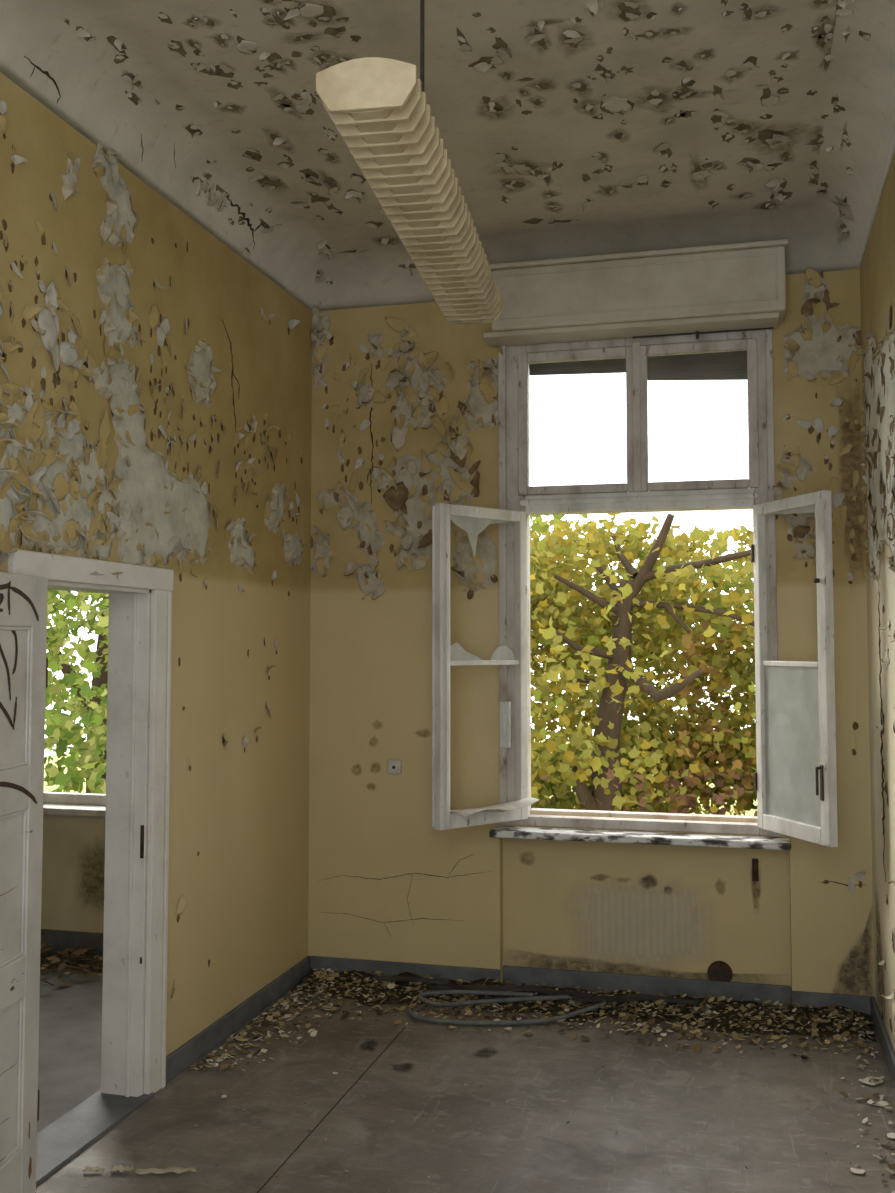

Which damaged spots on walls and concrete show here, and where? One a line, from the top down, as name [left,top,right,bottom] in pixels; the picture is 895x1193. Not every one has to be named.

peeling [61,18,160,105]
peeling [167,0,361,115]
peeling [456,27,552,118]
peeling [525,0,685,50]
peeling [811,0,871,70]
peeling [492,146,594,226]
peeling [572,47,797,209]
peeling [806,97,855,235]
peeling [772,267,895,592]
water stain [84,853,105,900]
crack [323,854,489,936]
peeling [880,989,895,1032]